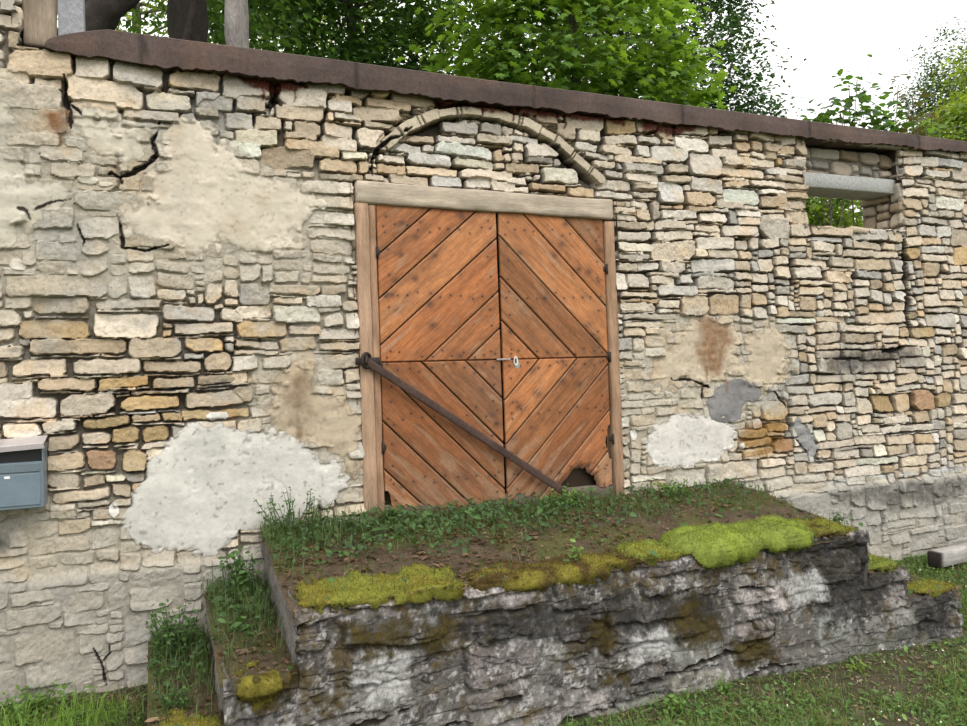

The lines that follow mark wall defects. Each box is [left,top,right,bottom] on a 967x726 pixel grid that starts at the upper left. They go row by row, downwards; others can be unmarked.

crack [63,74,82,129]
crack [108,122,160,184]
crack [17,199,66,220]
crack [119,222,169,252]